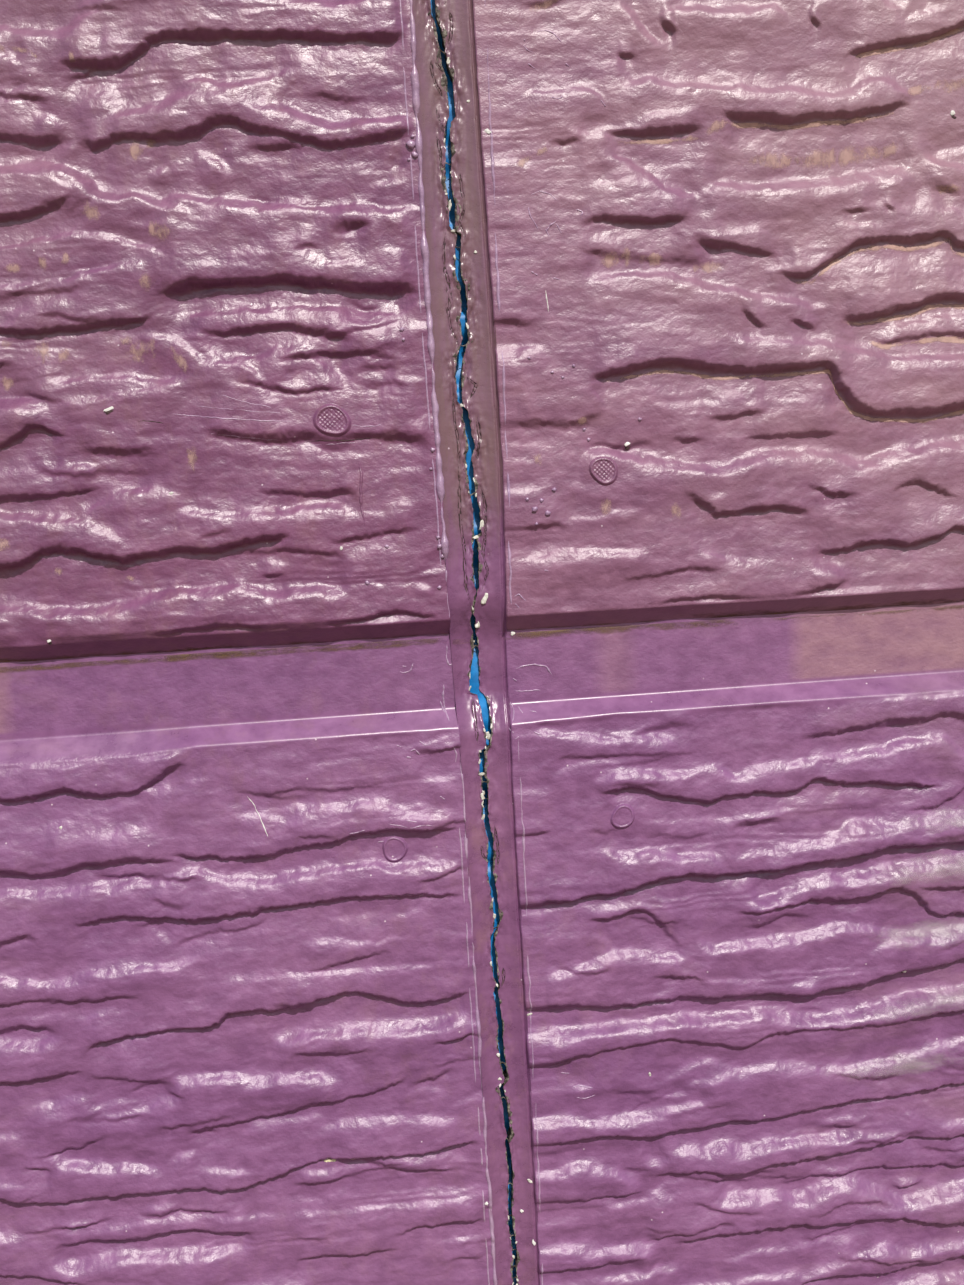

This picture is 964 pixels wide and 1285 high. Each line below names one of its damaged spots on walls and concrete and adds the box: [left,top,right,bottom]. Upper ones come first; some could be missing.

crack [427,0,520,1285]